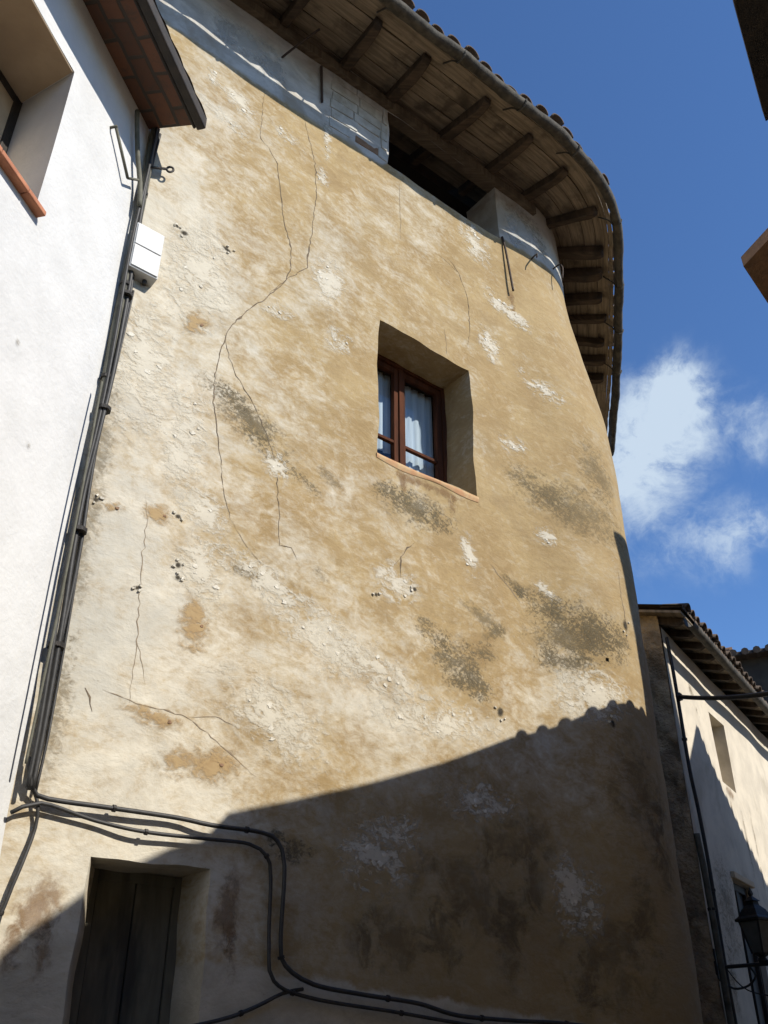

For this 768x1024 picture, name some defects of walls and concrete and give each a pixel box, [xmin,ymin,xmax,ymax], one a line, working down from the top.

crack [213,93,317,562]
mould [211,385,319,492]
damp [379,482,447,531]
crack [85,495,255,776]
mould [421,618,494,700]
mould [504,576,629,672]